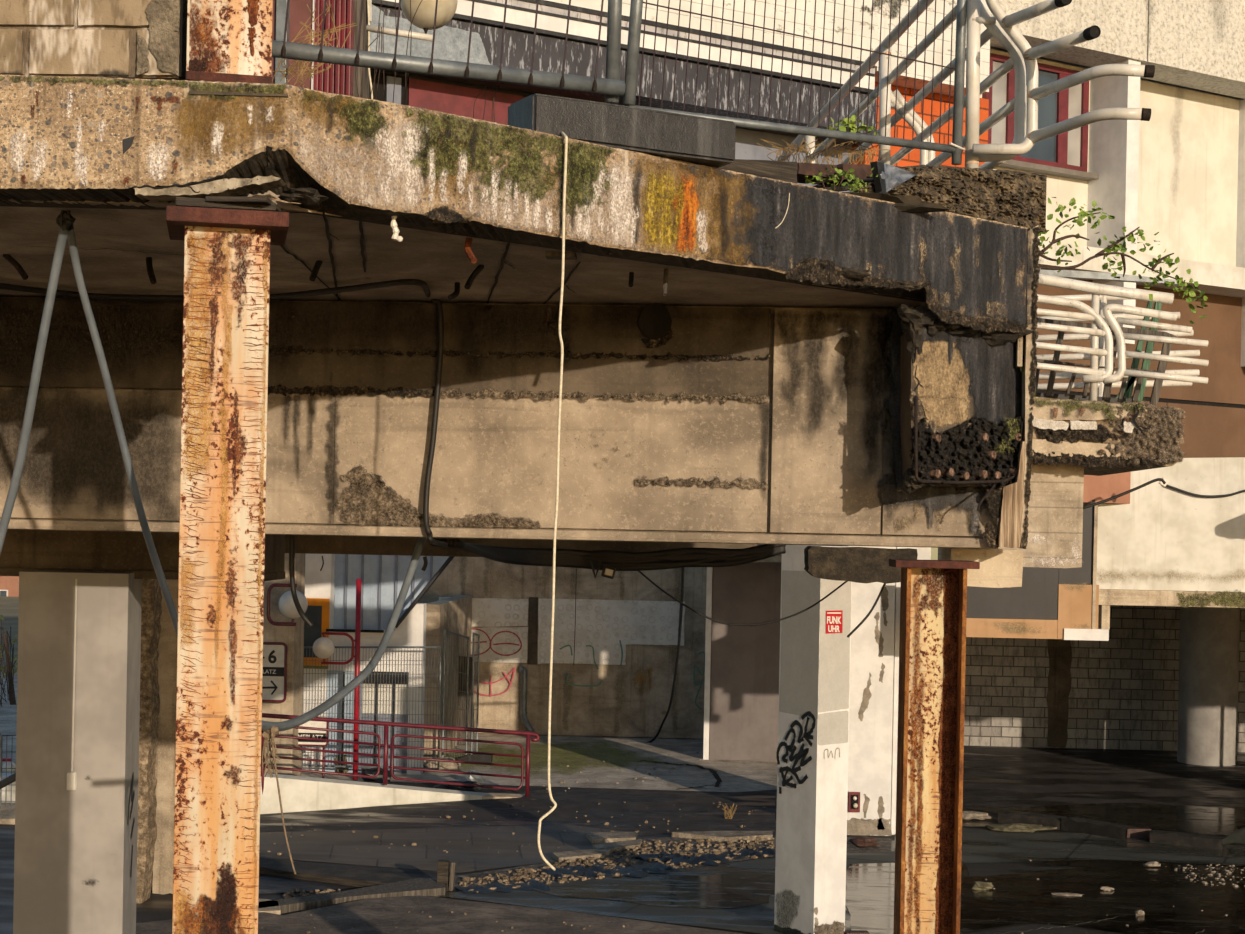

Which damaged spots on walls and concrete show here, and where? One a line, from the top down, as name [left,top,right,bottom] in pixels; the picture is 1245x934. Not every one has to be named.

efflorescence [11,130,47,179]
efflorescence [68,92,87,184]
crack [133,175,220,193]
rust [189,0,233,73]
rust [247,0,259,56]
damp [180,93,1041,433]
damp [0,294,183,517]
spalling [268,384,769,529]
damp [778,309,1000,534]
spalling [785,257,1186,549]
rust [175,231,268,934]
rust [907,569,959,934]